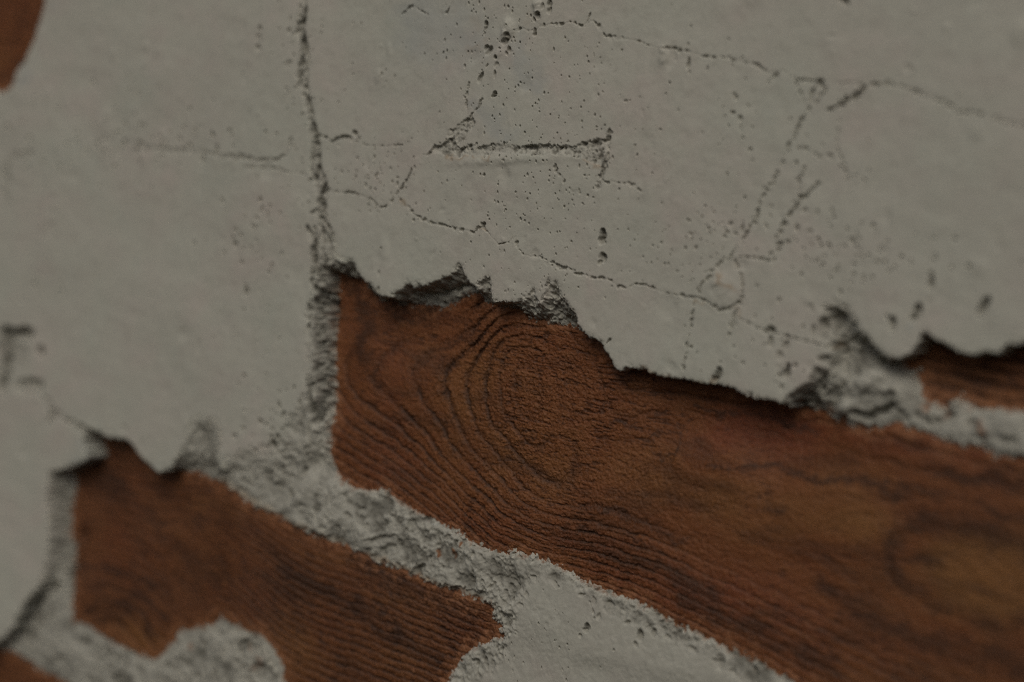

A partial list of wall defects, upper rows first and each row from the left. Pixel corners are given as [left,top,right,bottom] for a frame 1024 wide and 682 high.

crack [133,0,1024,426]
spalling [318,242,581,329]
spalling [298,310,339,466]
spalling [793,302,901,418]
spalling [169,416,237,483]
spalling [47,467,85,559]